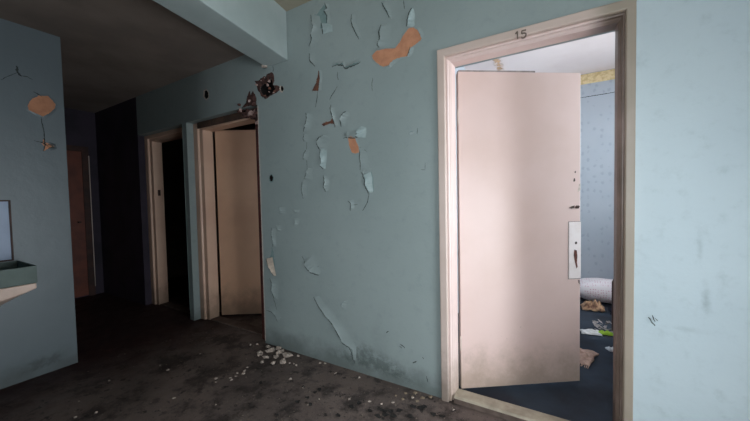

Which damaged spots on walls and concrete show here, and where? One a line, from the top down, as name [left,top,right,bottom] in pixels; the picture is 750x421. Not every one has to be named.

peeling [25,92,58,119]
flaking render [255,65,284,99]
peeling [309,2,333,107]
peeling [370,2,425,70]
peeling [316,106,374,211]
peeling [261,213,282,341]
peeling [314,296,358,360]